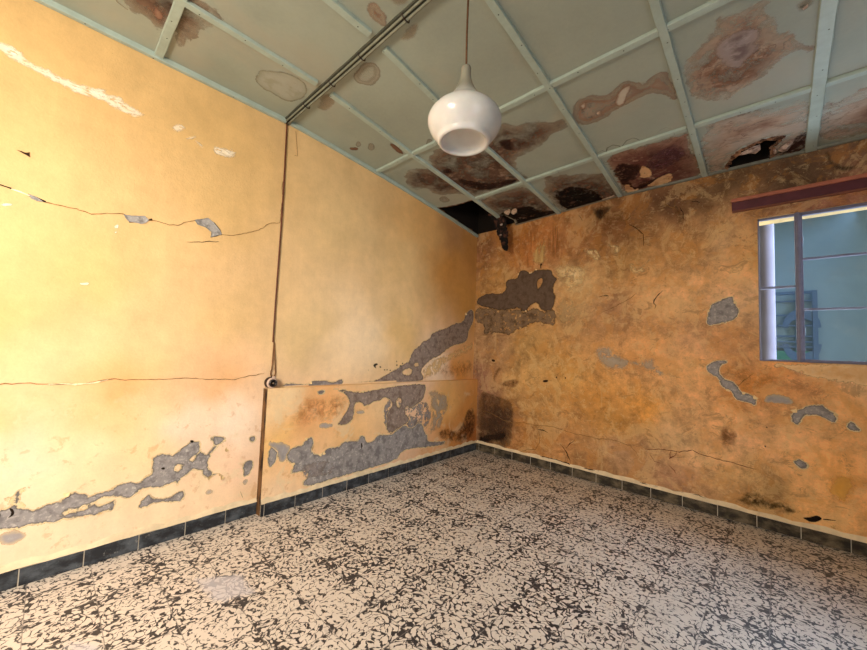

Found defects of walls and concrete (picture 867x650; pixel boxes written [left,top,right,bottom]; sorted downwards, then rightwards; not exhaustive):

leakage [129,0,172,26]
leakage [178,15,197,37]
leakage [689,4,809,98]
leakage [573,72,676,125]
leakage [409,102,809,224]
peeling [740,145,761,155]
crack [0,182,283,242]
crack [0,374,259,385]
flaking render [267,264,557,486]
leakage [440,393,512,447]
flaking render [706,360,861,432]
flaking render [0,435,229,545]